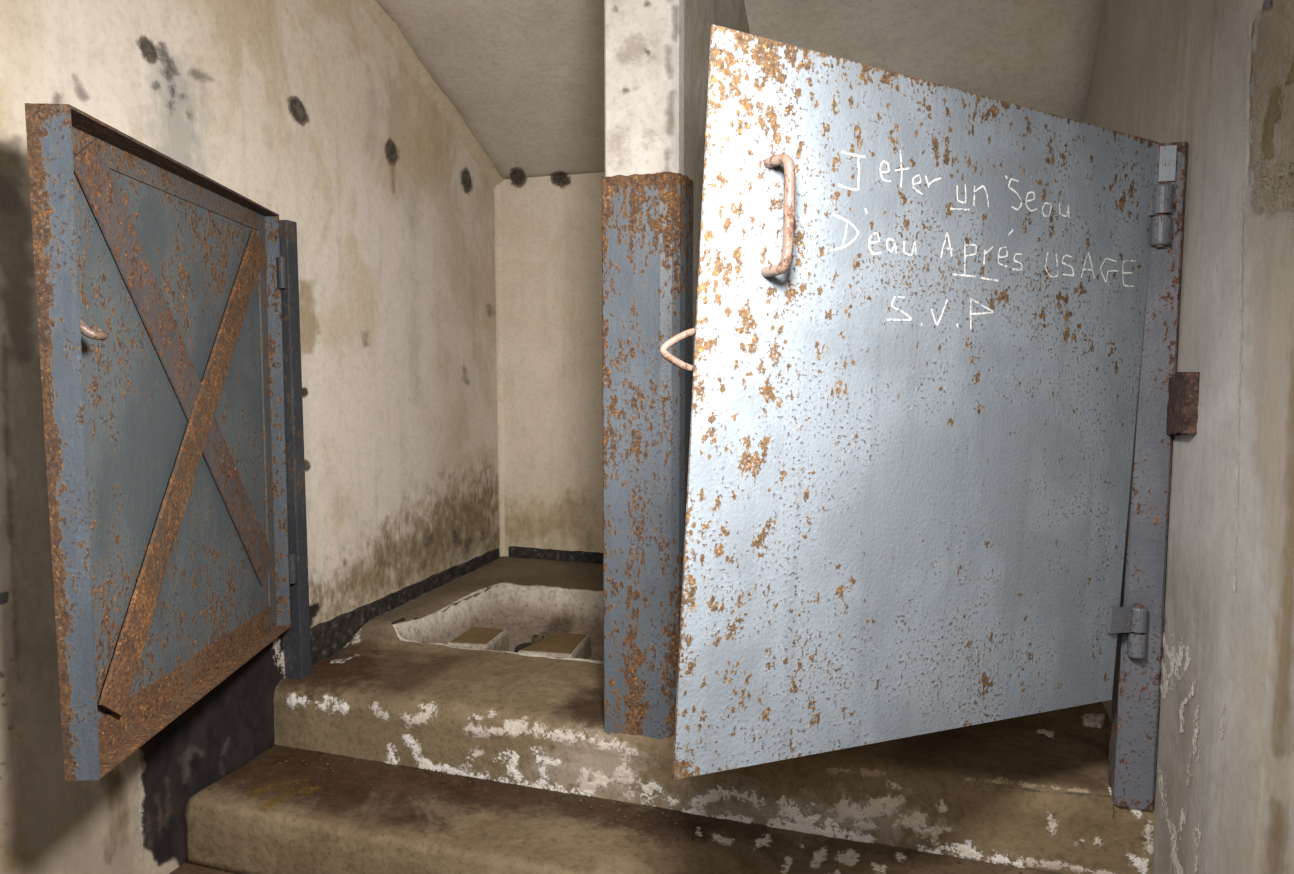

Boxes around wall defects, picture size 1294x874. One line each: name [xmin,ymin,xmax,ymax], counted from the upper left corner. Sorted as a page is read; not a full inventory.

spalling [1245,0,1294,214]
damp [314,487,497,623]
peeling [964,777,1115,818]